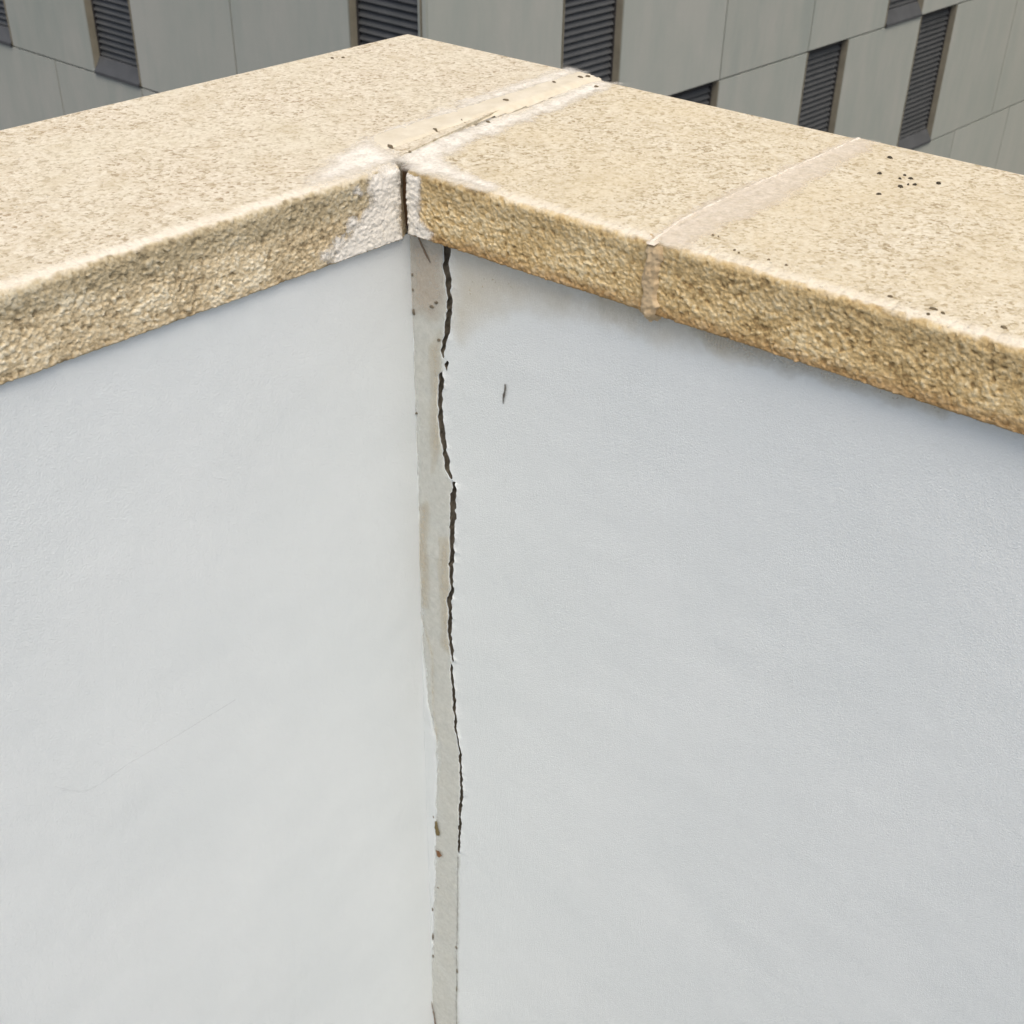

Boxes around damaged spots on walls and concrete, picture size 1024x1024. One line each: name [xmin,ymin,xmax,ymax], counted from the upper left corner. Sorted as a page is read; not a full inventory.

crack [418,238,463,872]